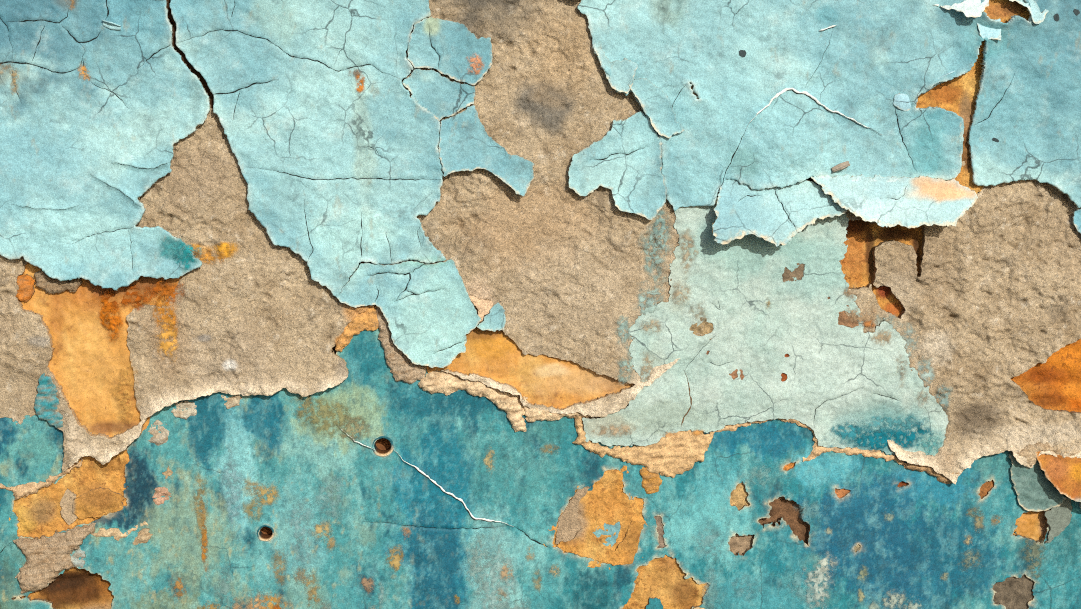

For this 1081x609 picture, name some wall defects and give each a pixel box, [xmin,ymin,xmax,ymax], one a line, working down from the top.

crack [0,0,124,103]
crack [140,0,393,119]
crack [717,25,917,197]
crack [72,162,170,268]
crack [252,146,441,259]
spalling [0,0,714,539]
spalling [712,0,1081,544]
spalling [13,567,114,609]
crack [372,455,548,547]
spalling [543,466,710,609]
peeling [728,496,809,555]
peeling [992,574,1034,609]